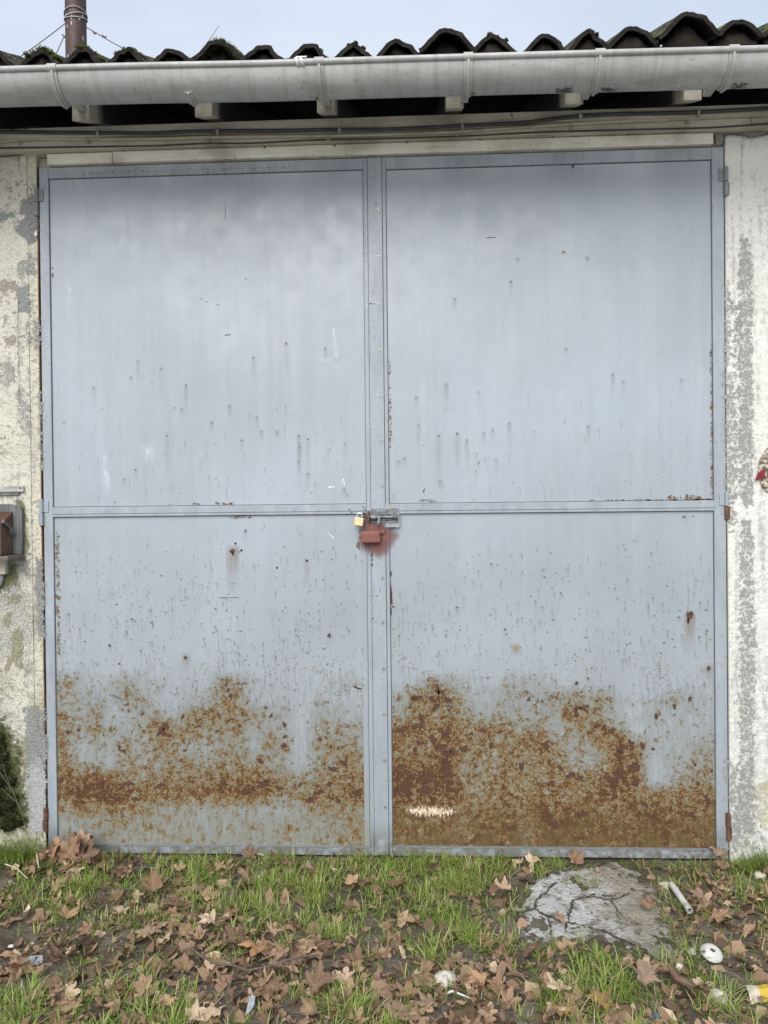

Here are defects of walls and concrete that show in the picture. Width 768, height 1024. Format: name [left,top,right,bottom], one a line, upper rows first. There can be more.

peeling [0,193,39,316]
spalling [0,362,16,388]
corrosion [589,344,713,502]
peeling [723,234,768,508]
peeling [738,520,755,587]
peeling [0,584,32,672]
corrosion [55,529,365,846]
corrosion [390,540,715,848]
crack [514,882,648,951]